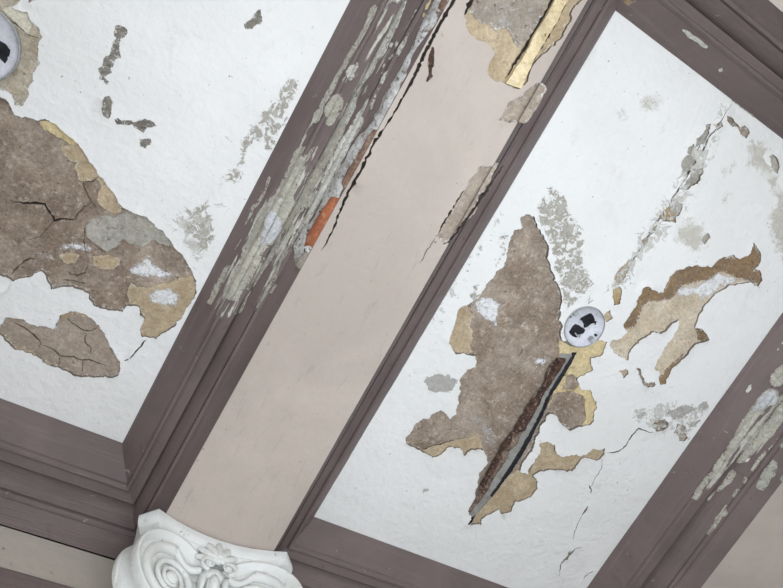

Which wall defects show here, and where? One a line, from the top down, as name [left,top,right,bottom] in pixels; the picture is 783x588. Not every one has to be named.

spalling [464,0,550,123]
spalling [533,0,580,63]
spalling [0,0,225,338]
peeling [206,0,448,319]
spalling [437,162,499,243]
peeling [605,99,754,298]
spalling [0,311,120,377]
spalling [405,187,761,523]
corrosion [468,357,566,513]
peeling [691,364,783,501]
peeling [706,505,728,535]